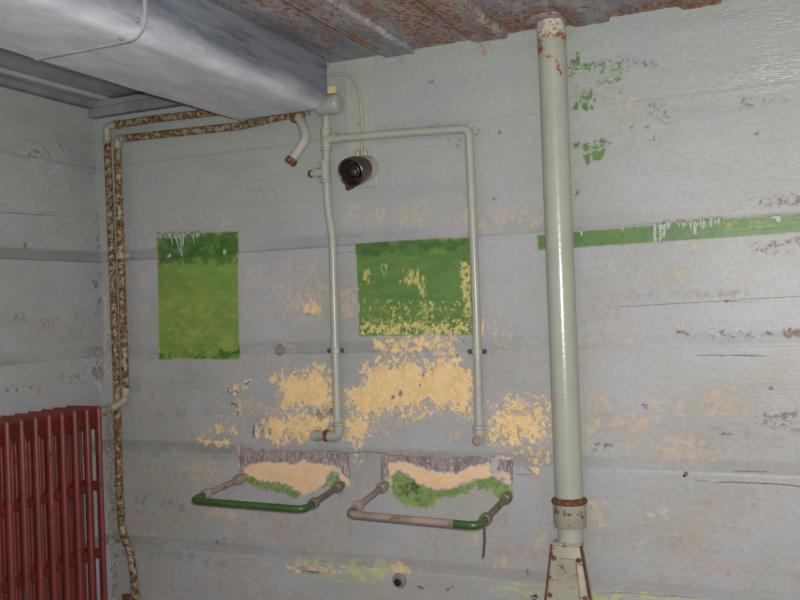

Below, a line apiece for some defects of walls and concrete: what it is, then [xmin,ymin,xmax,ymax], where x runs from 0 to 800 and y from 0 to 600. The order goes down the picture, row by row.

rust [241,0,587,76]
peeling [567,51,658,112]
peeling [572,137,613,166]
crack [606,296,800,308]
peeling [89,255,558,600]
crack [692,470,800,487]